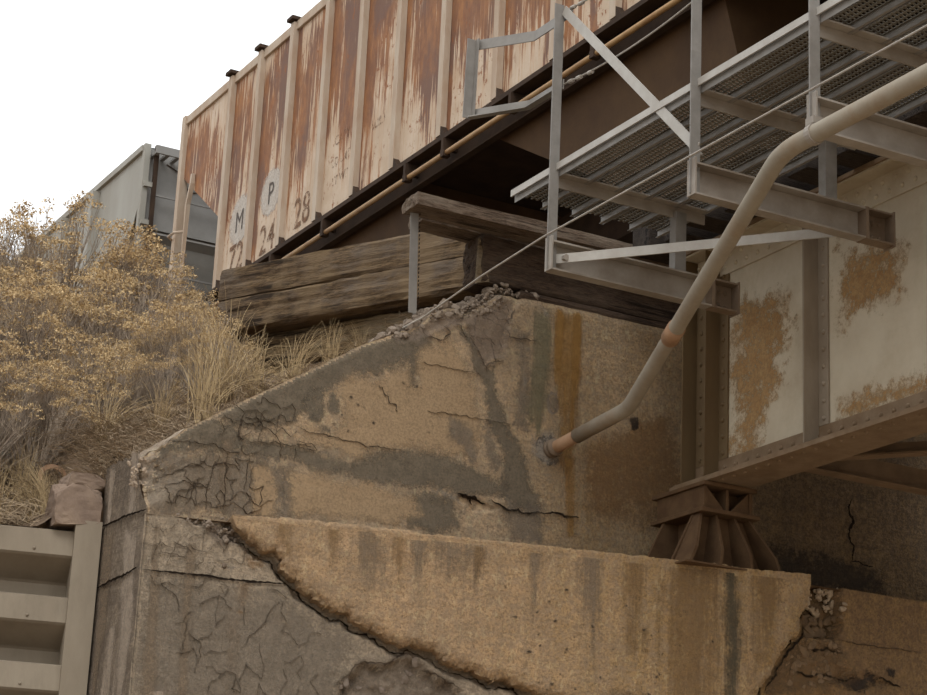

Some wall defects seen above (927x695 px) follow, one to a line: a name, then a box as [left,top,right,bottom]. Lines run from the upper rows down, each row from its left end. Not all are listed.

corrosion [840,239,910,320]
corrosion [554,310,581,437]
corrosion [728,292,797,455]
crack [97,396,459,695]
water stain [407,491,483,576]
water stain [459,330,559,599]
crack [458,493,579,518]
crack [848,499,873,567]
peeling [784,587,847,688]
crack [796,640,918,681]